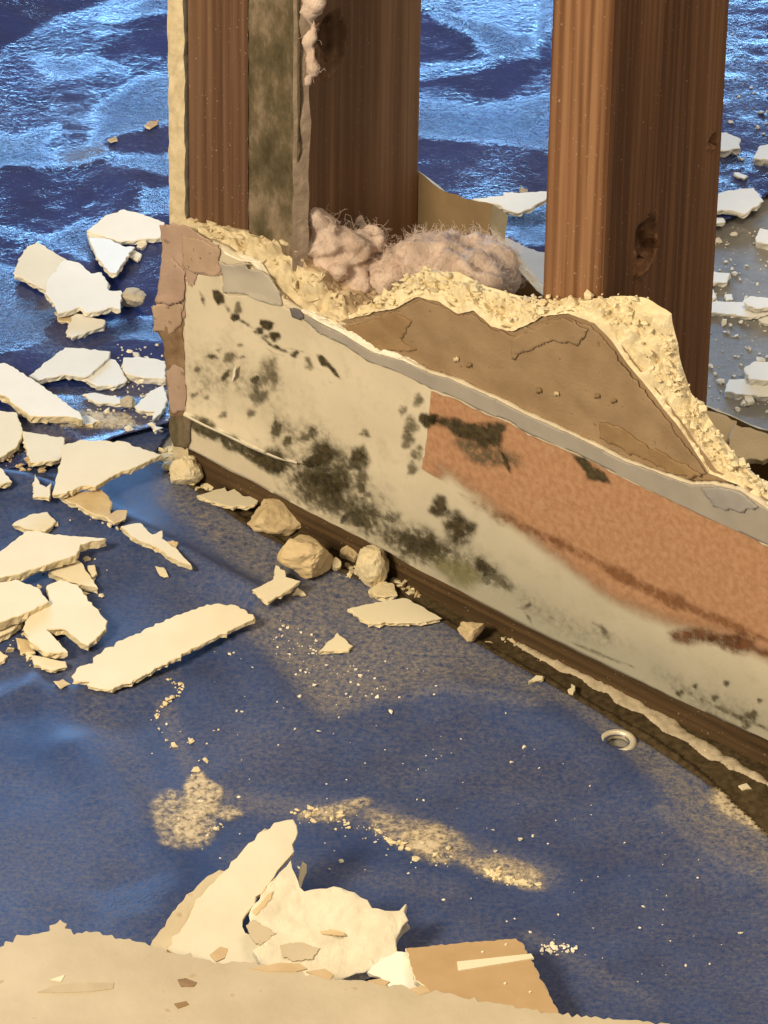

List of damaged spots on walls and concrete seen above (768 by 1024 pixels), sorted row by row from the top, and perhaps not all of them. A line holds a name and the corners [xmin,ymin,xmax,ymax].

leakage [201,290,339,416]
leakage [190,412,510,588]
peeling [188,218,768,545]
leakage [399,391,768,656]